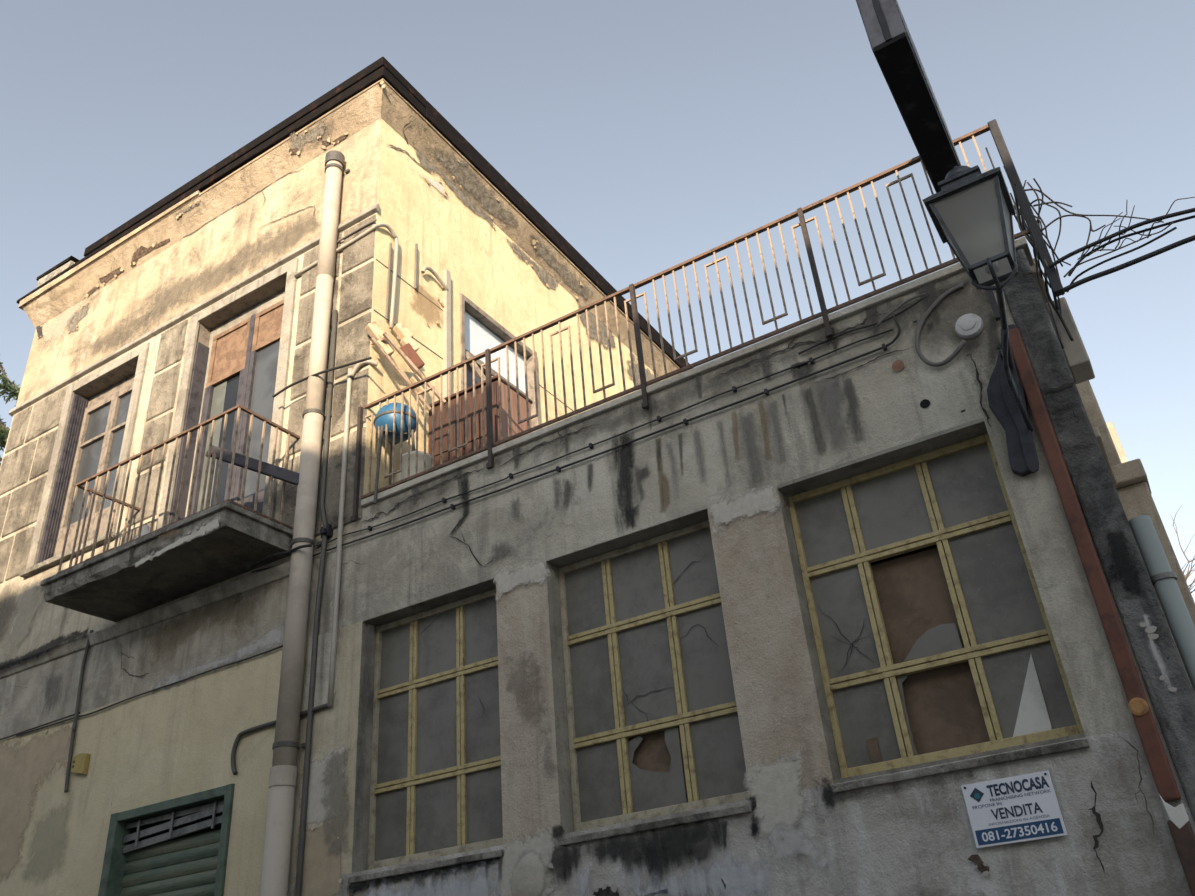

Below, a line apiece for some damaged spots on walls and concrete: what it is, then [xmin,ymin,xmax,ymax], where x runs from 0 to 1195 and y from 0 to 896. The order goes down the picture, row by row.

water stain [555,480,570,508]
water stain [614,434,649,527]
water stain [694,430,704,481]
water stain [743,414,761,479]
water stain [791,362,862,451]
crack [449,525,496,567]
water stain [153,626,284,693]
peeling [294,745,347,896]
water stain [551,796,833,896]
crack [1088,781,1105,874]